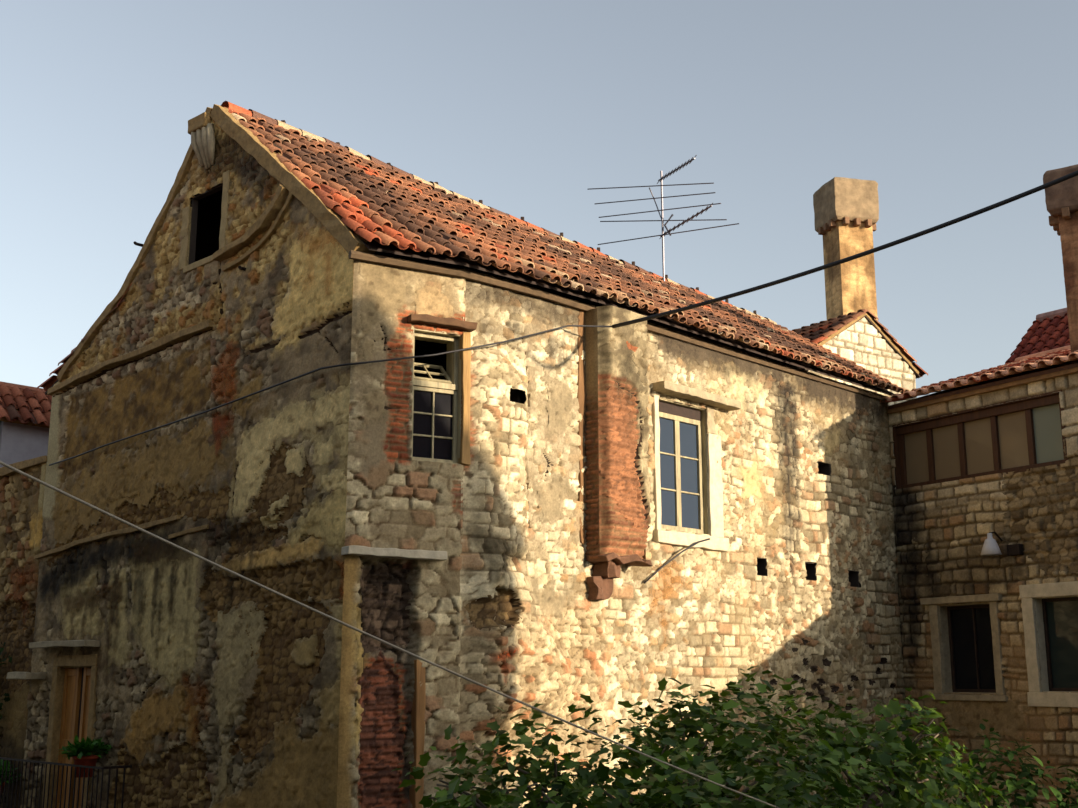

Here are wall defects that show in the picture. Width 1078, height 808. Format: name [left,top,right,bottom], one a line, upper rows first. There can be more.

flaking render [271,231,453,367]
flaking render [544,380,573,437]
flaking render [536,475,566,529]
flaking render [0,598,36,697]
leakage [40,525,192,642]
flaking render [28,373,387,808]
spalling [354,564,413,808]
spalling [464,585,525,632]